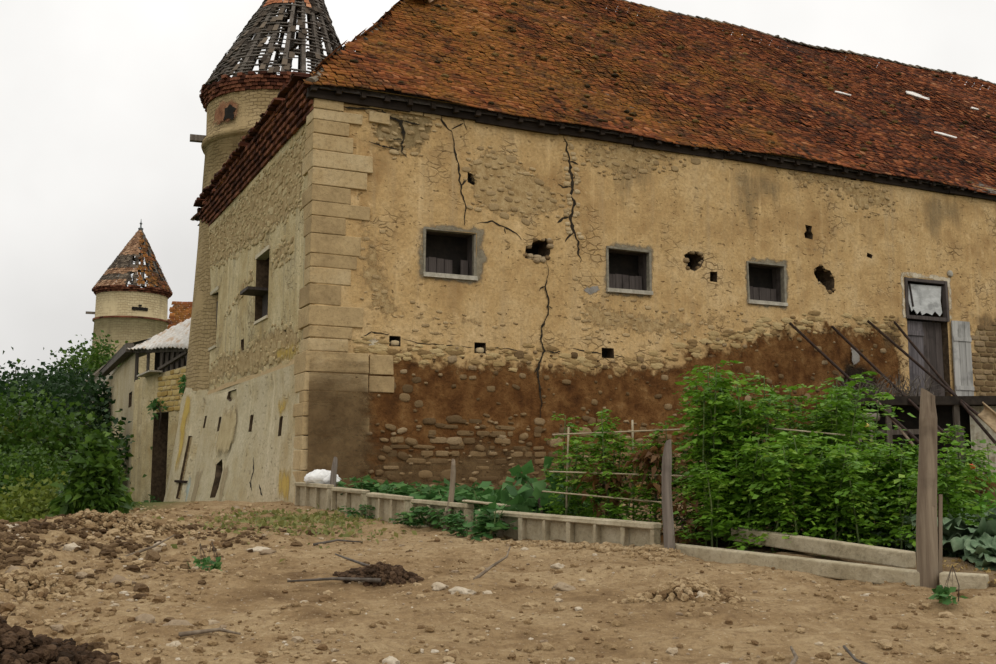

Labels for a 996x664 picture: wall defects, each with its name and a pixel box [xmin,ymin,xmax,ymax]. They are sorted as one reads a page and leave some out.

crack [344,106,522,240]
flaking render [462,146,566,226]
crack [557,136,584,262]
flaking render [358,229,404,318]
spalling [523,237,554,264]
spalling [683,251,717,282]
spalling [814,264,836,294]
crack [535,262,560,418]
flaking render [352,293,908,502]